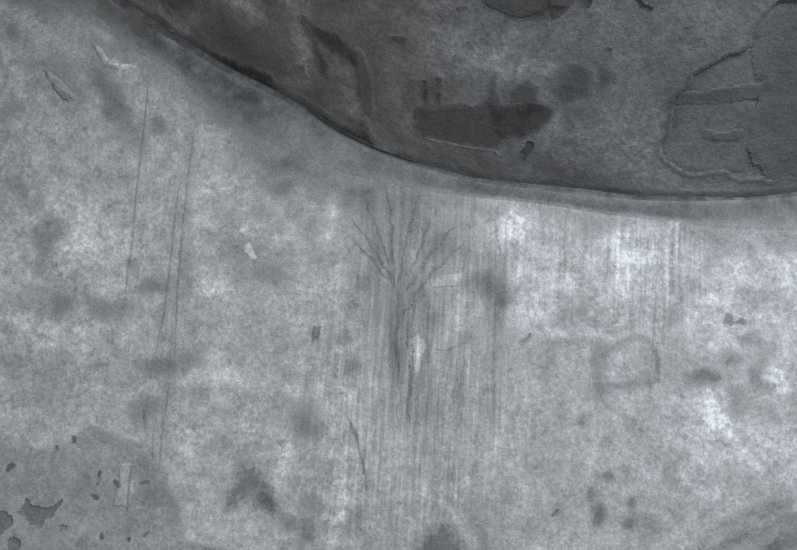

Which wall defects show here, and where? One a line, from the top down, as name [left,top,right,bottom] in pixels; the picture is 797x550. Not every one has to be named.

crack [112,0,797,306]
crack [405,363,413,425]